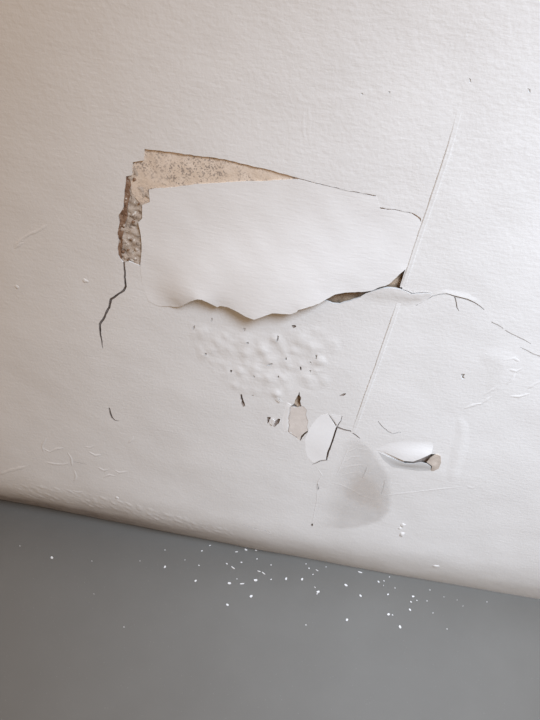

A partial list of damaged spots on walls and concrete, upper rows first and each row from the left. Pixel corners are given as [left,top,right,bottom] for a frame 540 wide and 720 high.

peeling [118,149,432,320]
crack [99,261,127,348]
crack [404,289,540,358]
peeling [267,394,341,463]
peeling [376,441,441,471]